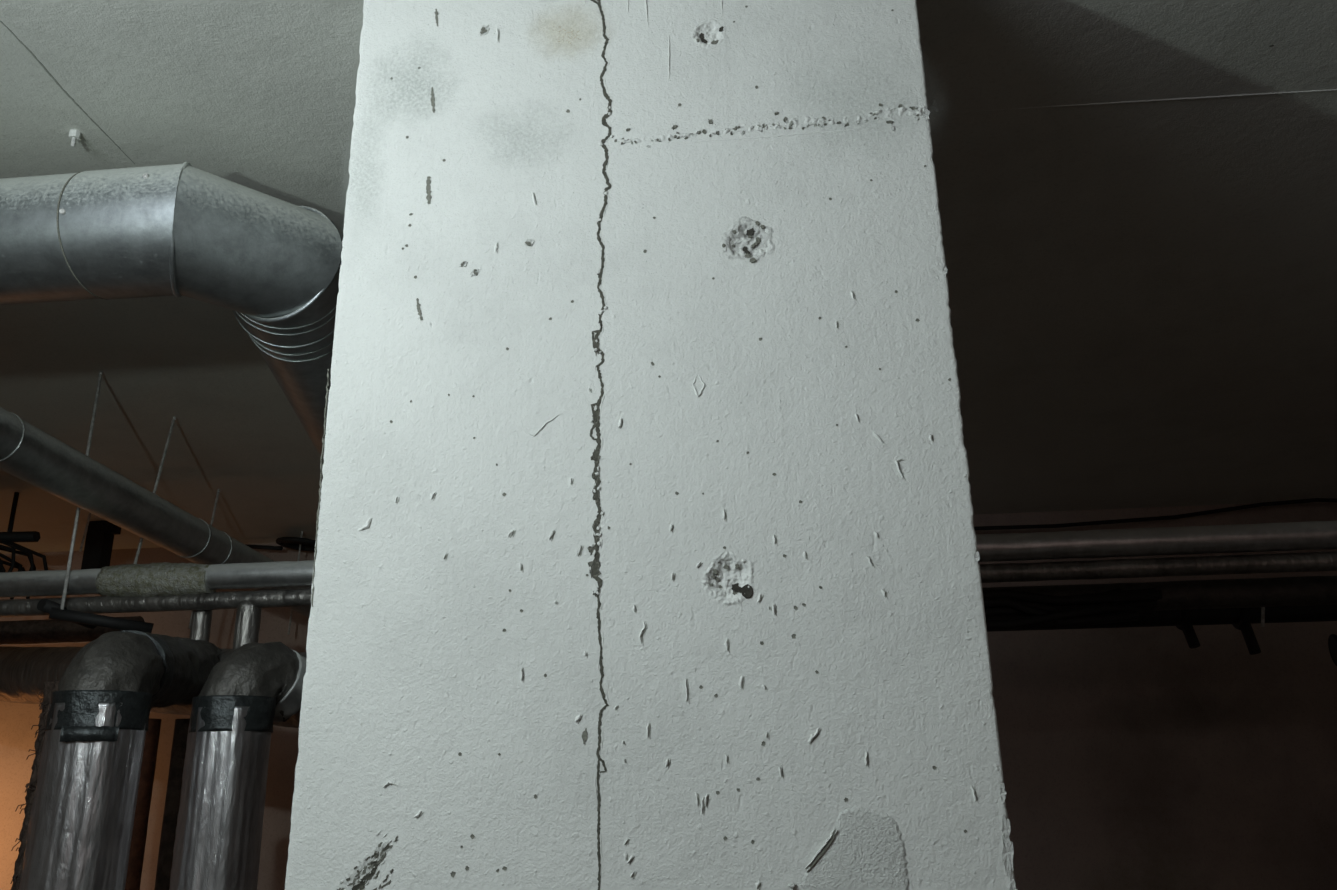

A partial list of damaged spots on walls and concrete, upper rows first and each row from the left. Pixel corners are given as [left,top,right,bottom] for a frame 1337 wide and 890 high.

spalling [691,19,726,49]
spalling [722,216,775,263]
crack [588,0,613,890]
spalling [701,552,755,607]
spalling [337,831,398,890]